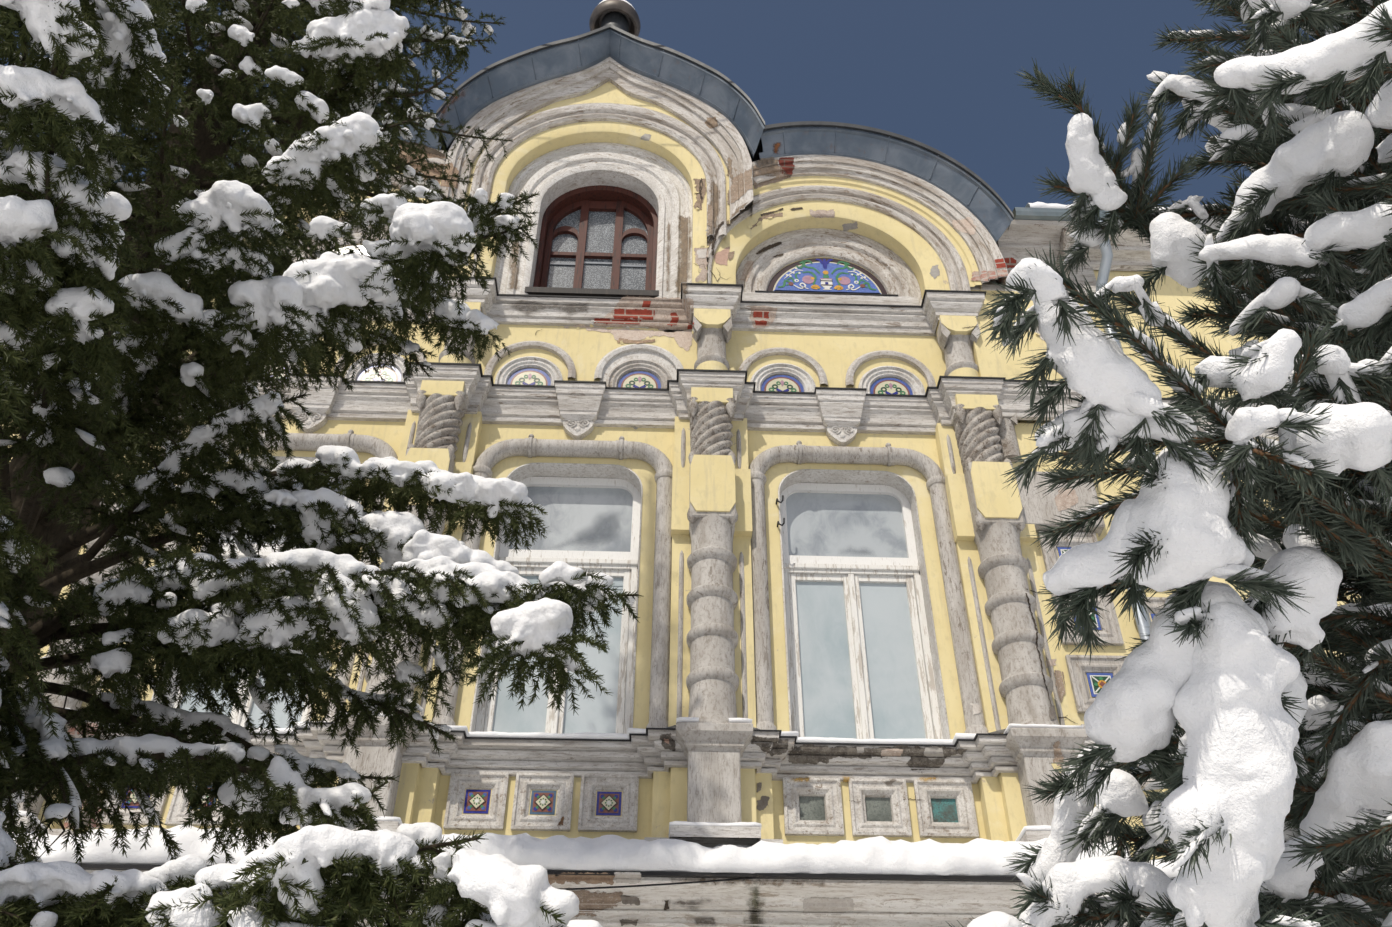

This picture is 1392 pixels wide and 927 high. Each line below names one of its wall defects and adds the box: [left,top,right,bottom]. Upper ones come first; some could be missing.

peeling [383,57,1017,290]
spalling [564,296,695,351]
spalling [749,305,777,329]
leakage [664,901,715,925]